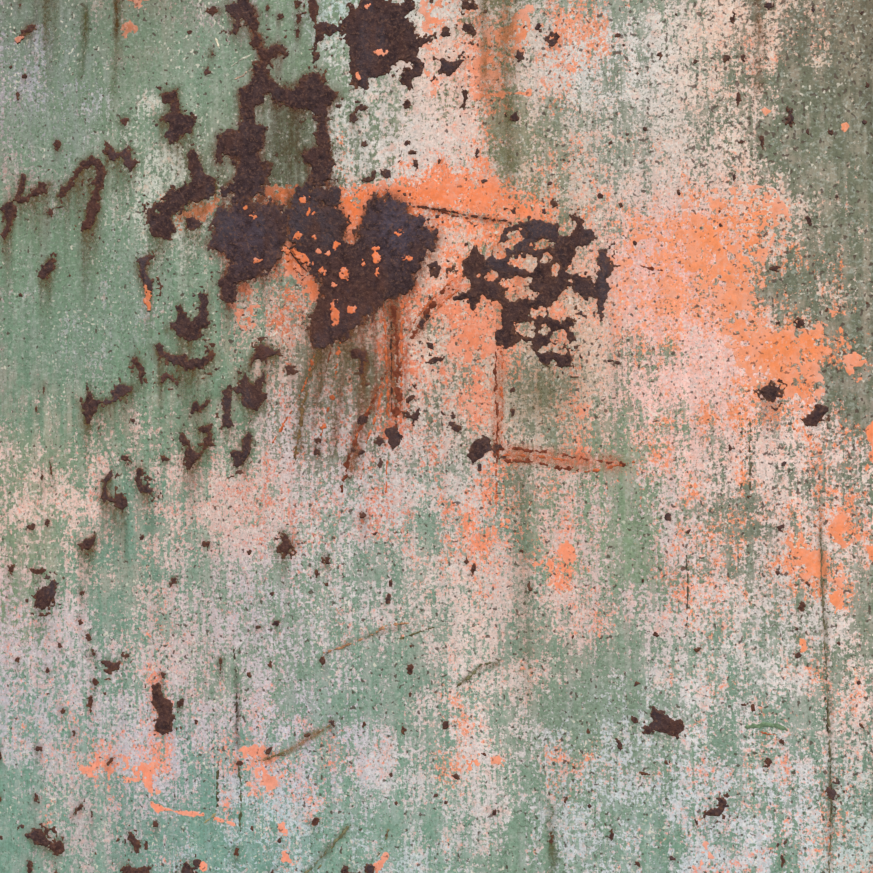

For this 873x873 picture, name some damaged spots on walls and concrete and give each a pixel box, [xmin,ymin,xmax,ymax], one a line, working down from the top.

rust [0,139,145,249]
rust [72,0,621,479]
peeling [616,182,846,414]
peeling [838,327,867,383]
peeling [865,421,873,471]
rust [95,455,163,518]
peeling [784,512,848,614]
rust [144,672,184,736]
rust [631,701,685,739]
peeling [77,757,236,826]
rust [17,822,68,858]